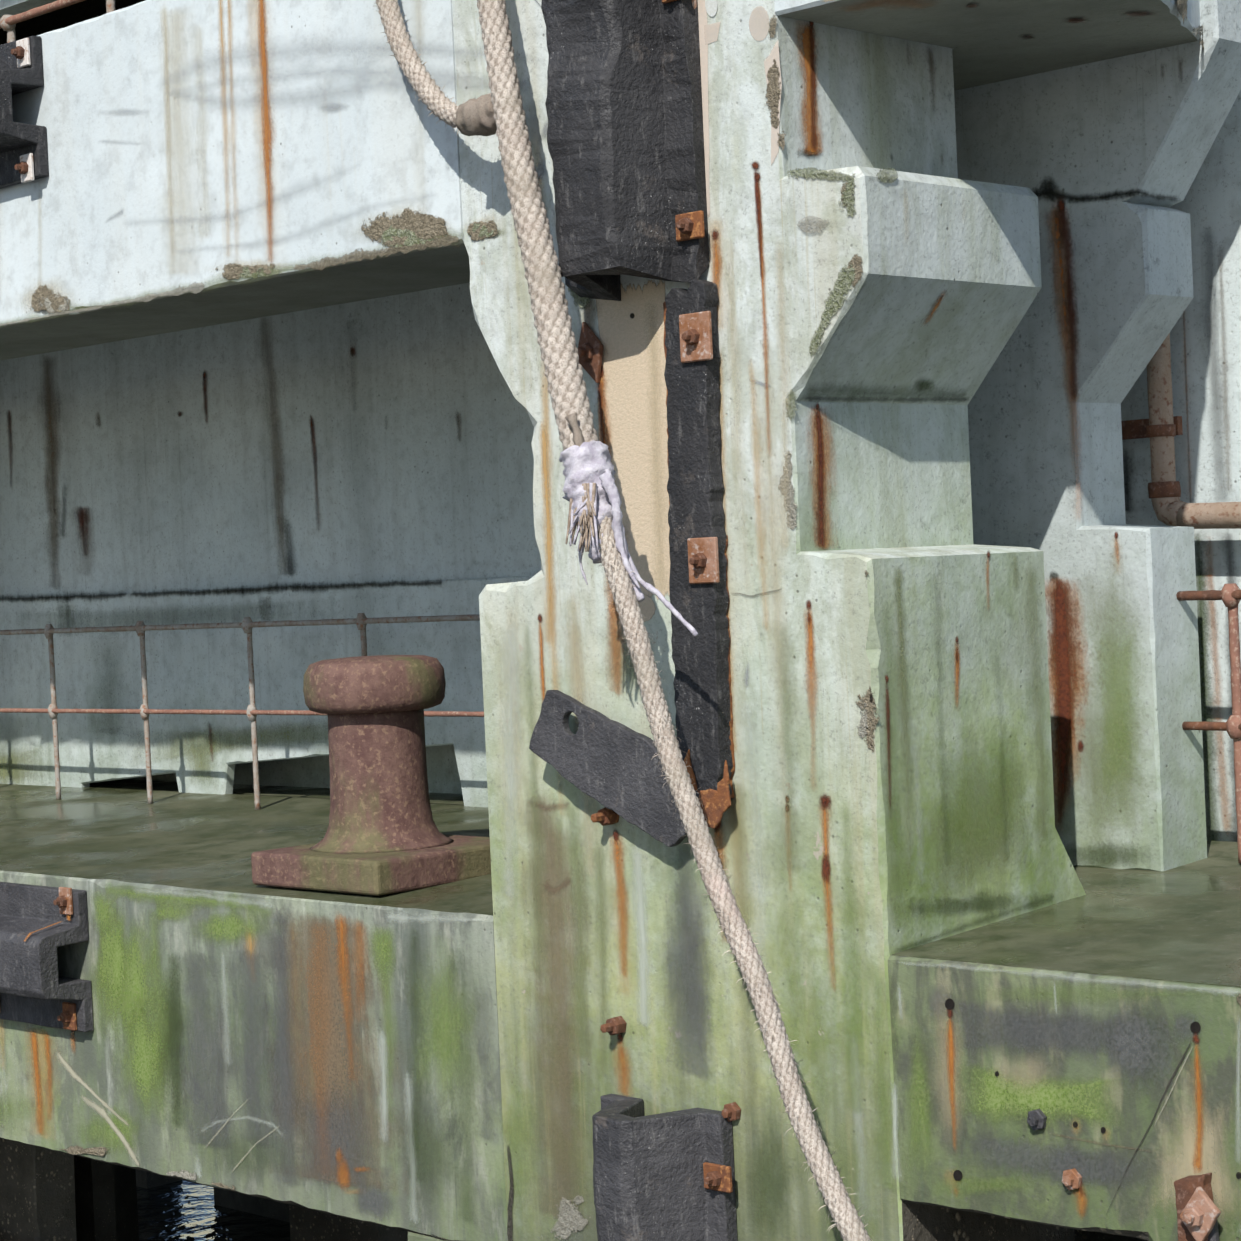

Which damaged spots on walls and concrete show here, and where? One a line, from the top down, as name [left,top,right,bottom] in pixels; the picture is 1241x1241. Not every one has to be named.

corrosion [259,0,271,236]
corrosion [797,22,821,156]
spalling [1177,0,1204,50]
spalling [0,282,204,326]
spalling [215,208,499,280]
damp [44,361,58,554]
corrosion [813,403,830,547]
corrosion [1048,573,1084,822]
damp [95,897,125,1004]
damp [82,1097,139,1166]
damp [124,990,224,1146]
crack [506,1146,514,1241]